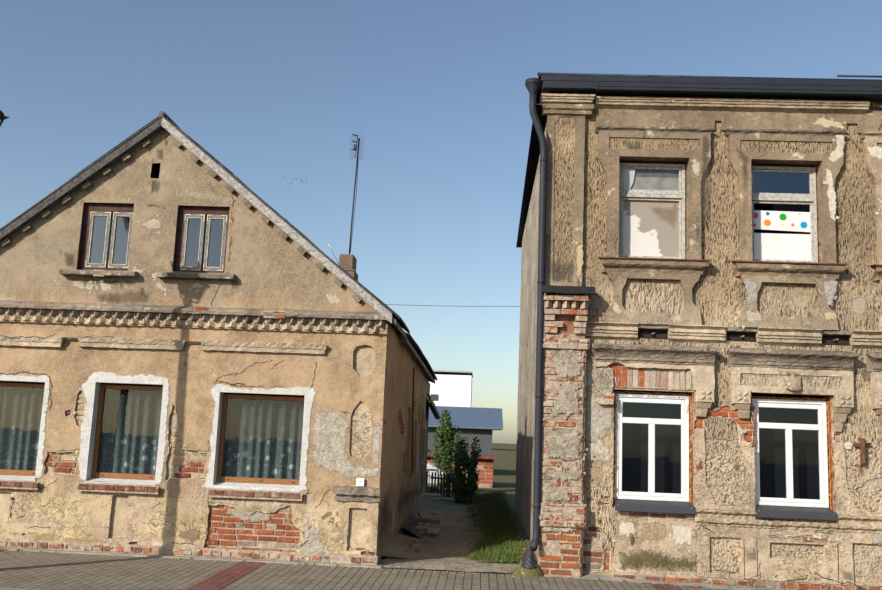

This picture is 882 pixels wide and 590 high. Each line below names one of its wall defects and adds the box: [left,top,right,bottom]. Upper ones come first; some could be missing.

crack [215,360,283,387]
spalling [43,451,79,477]
spalling [164,403,208,482]
peeling [311,404,383,479]
spalling [543,349,695,506]
spalling [691,403,755,447]
spalling [179,504,378,556]
spalling [542,517,695,573]